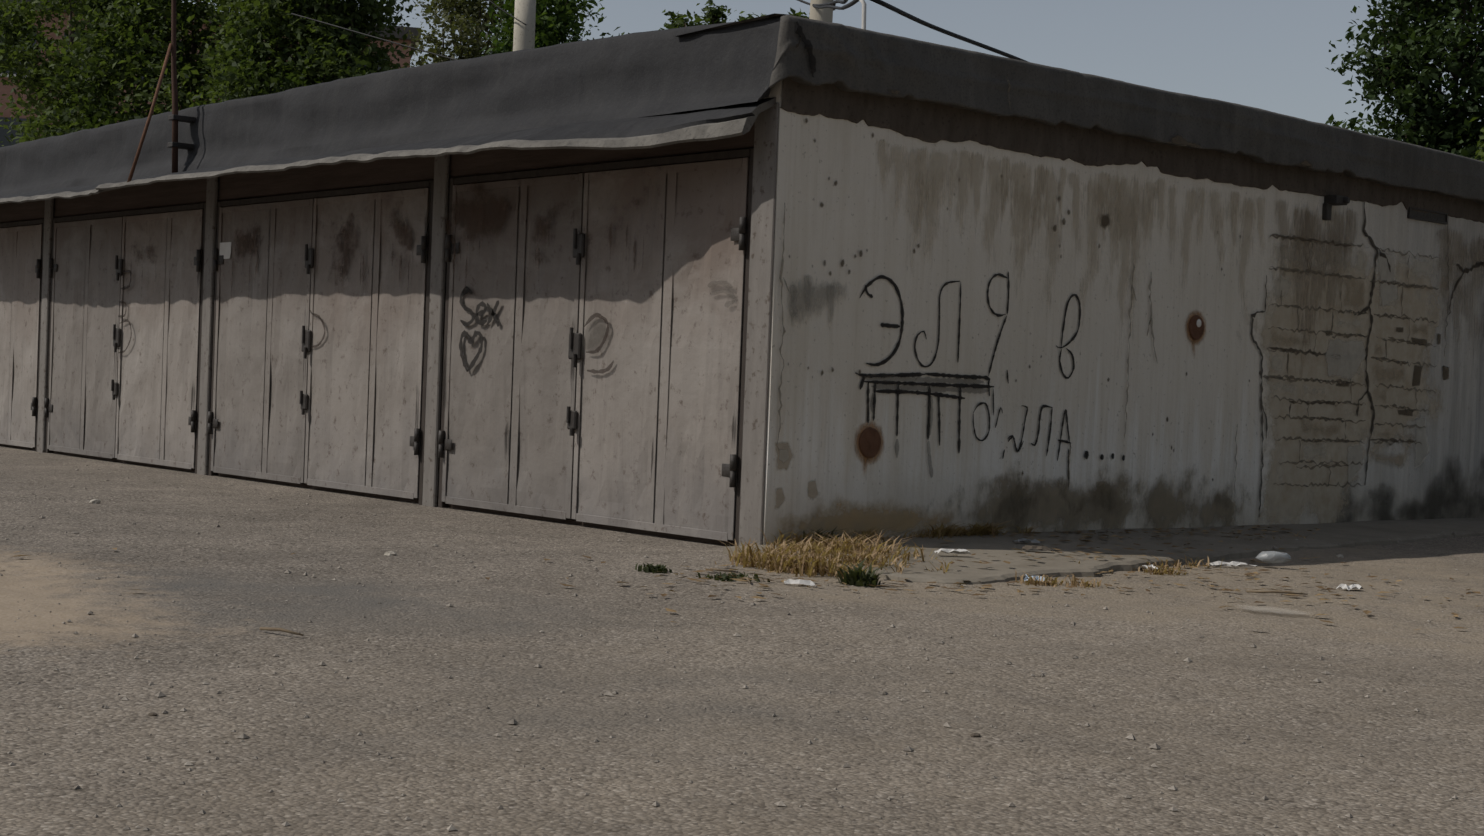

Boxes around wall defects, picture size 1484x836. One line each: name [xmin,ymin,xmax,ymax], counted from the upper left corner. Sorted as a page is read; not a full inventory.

spalling [1249,234,1449,524]
damp [1373,467,1484,520]